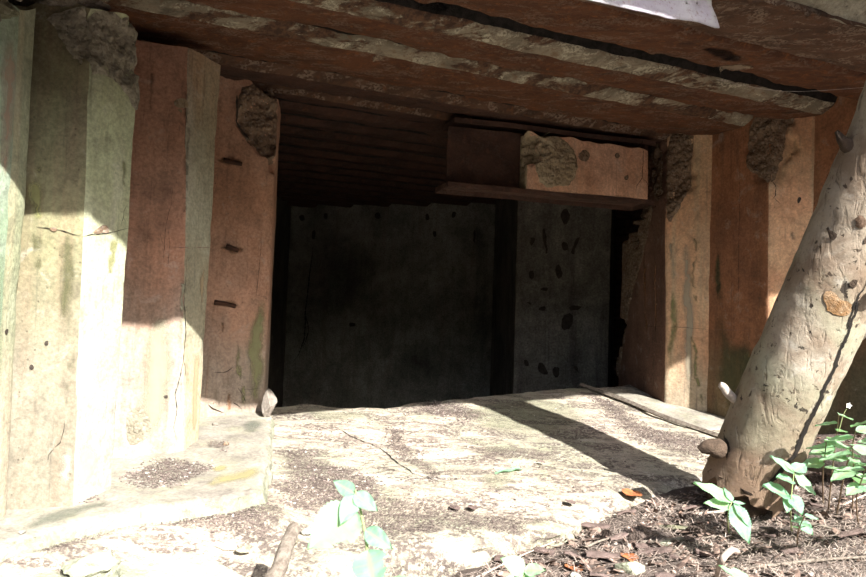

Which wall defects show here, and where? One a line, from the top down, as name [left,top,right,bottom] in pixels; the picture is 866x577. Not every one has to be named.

spalling [0,0,140,110]
spalling [238,84,278,165]
spalling [523,132,590,188]
spalling [746,117,794,183]
crack [40,207,128,237]
spalling [616,133,694,377]
rust [214,300,237,308]
crack [174,282,186,435]